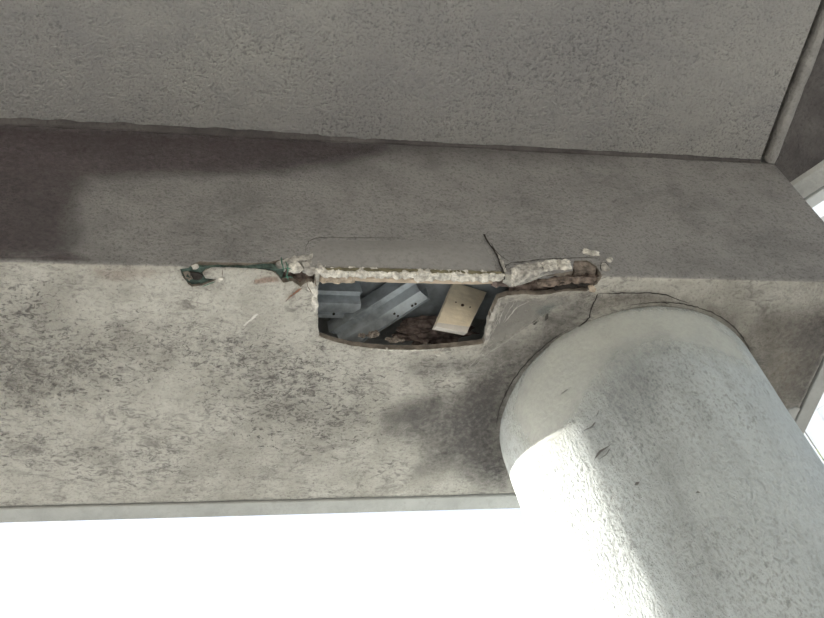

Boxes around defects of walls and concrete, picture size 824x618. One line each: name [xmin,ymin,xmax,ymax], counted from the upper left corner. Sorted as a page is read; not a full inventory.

spalling [180,248,613,372]
crack [483,233,609,280]
crack [496,292,751,425]